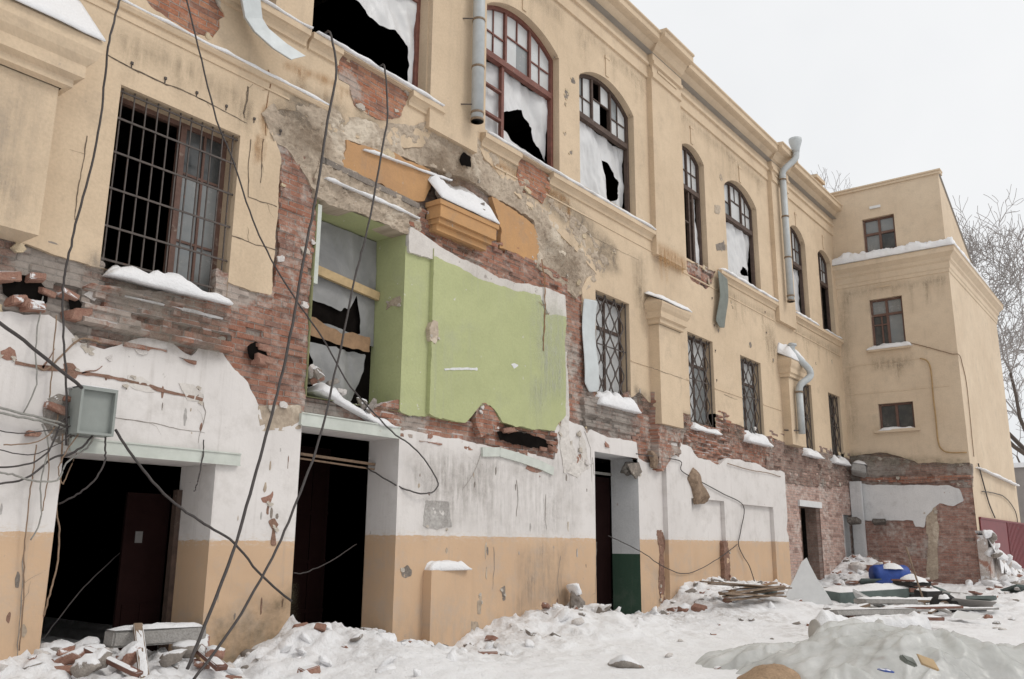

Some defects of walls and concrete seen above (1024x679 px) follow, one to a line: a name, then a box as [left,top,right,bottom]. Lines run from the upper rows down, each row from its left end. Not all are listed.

flaking render [147,0,224,40]
flaking render [337,56,409,120]
spalling [459,152,471,167]
flaking render [505,159,550,210]
flaking render [0,134,317,434]
flaking render [43,394,75,446]
flaking render [371,208,981,585]
flaking render [260,482,279,546]